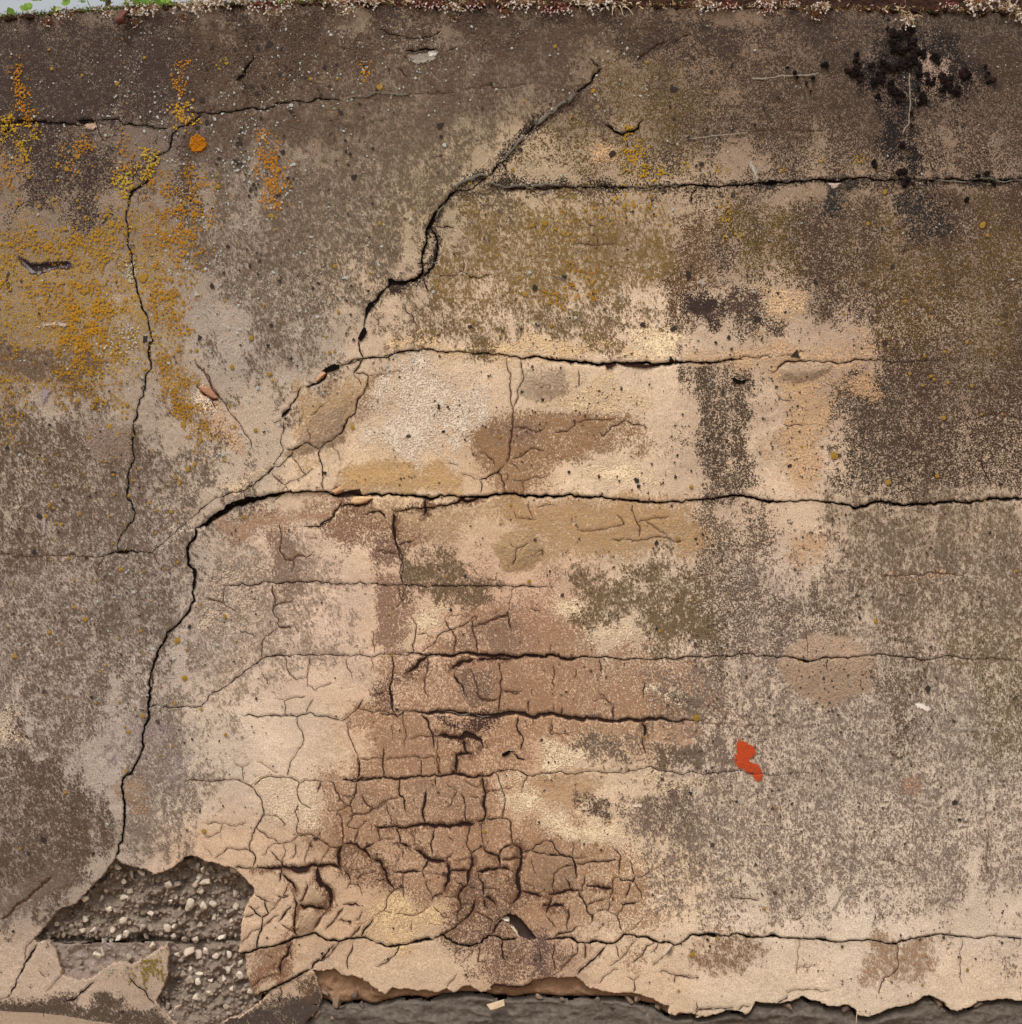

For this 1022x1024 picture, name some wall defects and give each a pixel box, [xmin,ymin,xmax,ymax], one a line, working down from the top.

crack [0,9,1022,570]
spalling [38,855,262,1024]
spalling [315,968,695,1015]
crack [115,510,1022,1006]